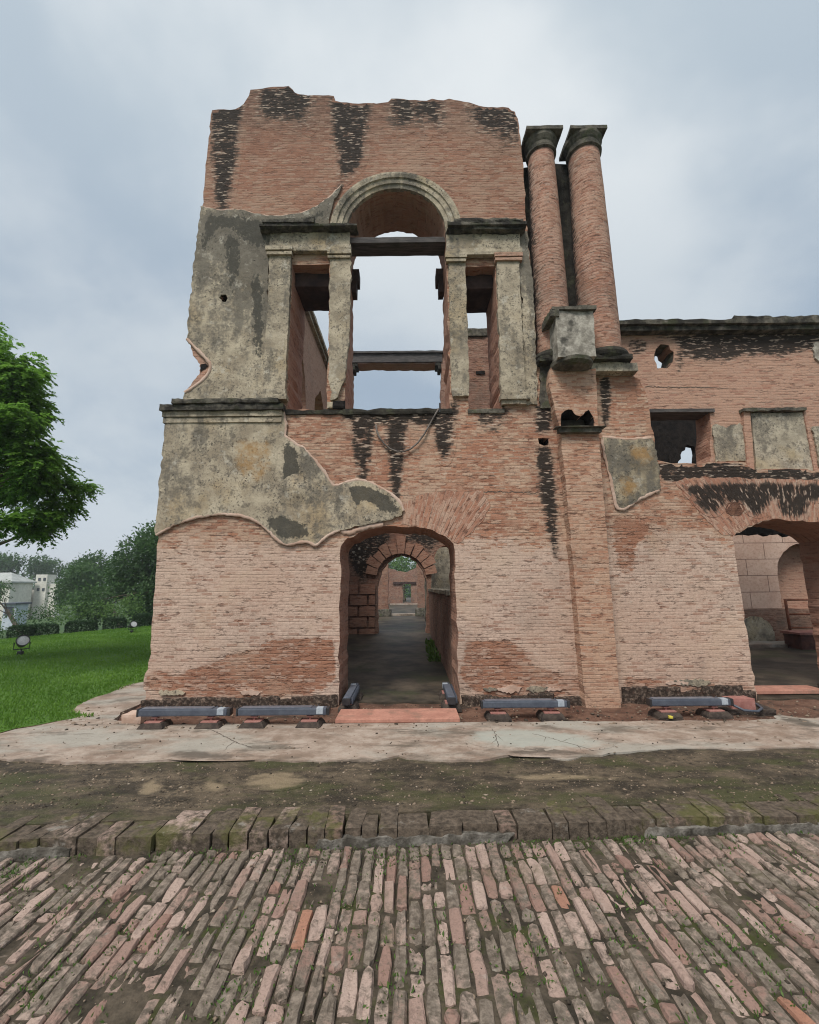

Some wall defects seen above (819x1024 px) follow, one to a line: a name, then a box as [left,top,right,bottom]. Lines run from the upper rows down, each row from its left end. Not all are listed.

water stain [207,86,521,210]
flaking render [183,184,343,399]
flaking render [154,411,405,564]
spalling [327,400,345,410]
water stain [336,398,518,502]
water stain [531,401,563,563]
flaking render [519,231,594,426]
water stain [597,376,613,432]
flaking render [601,436,661,511]
water stain [625,334,819,377]
water stain [659,463,819,521]